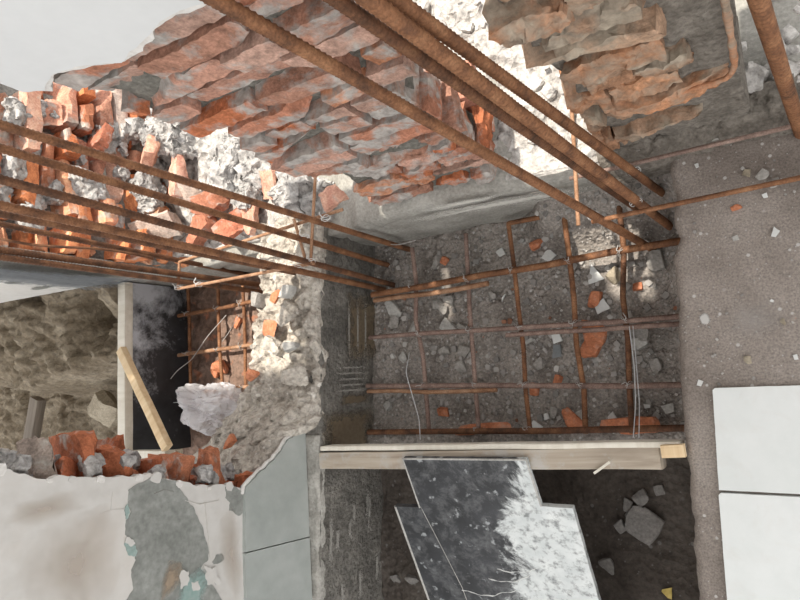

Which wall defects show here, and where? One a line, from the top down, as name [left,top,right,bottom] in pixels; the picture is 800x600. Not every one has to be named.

spalling [0,0,738,453]
peeling [0,430,292,600]
spalling [313,469,384,600]